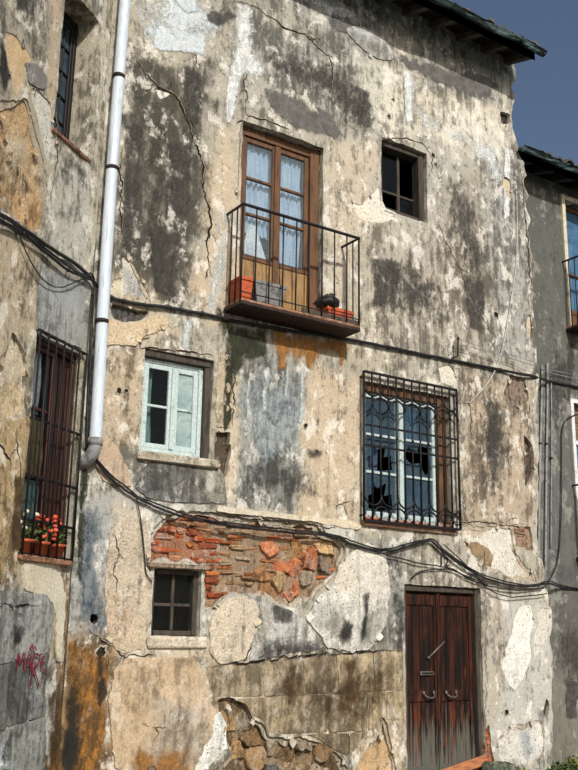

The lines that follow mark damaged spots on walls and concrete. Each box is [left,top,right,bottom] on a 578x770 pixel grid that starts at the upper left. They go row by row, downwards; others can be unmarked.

crack [235,1,334,98]
peeling [0,32,58,238]
leakage [123,124,192,294]
crack [137,59,217,279]
leakage [372,258,445,324]
rust [273,330,347,369]
crack [0,434,22,478]
leakage [223,364,316,496]
flaking render [146,511,348,610]
peeling [502,605,552,689]
rust [46,640,109,770]
flaking render [204,697,346,770]